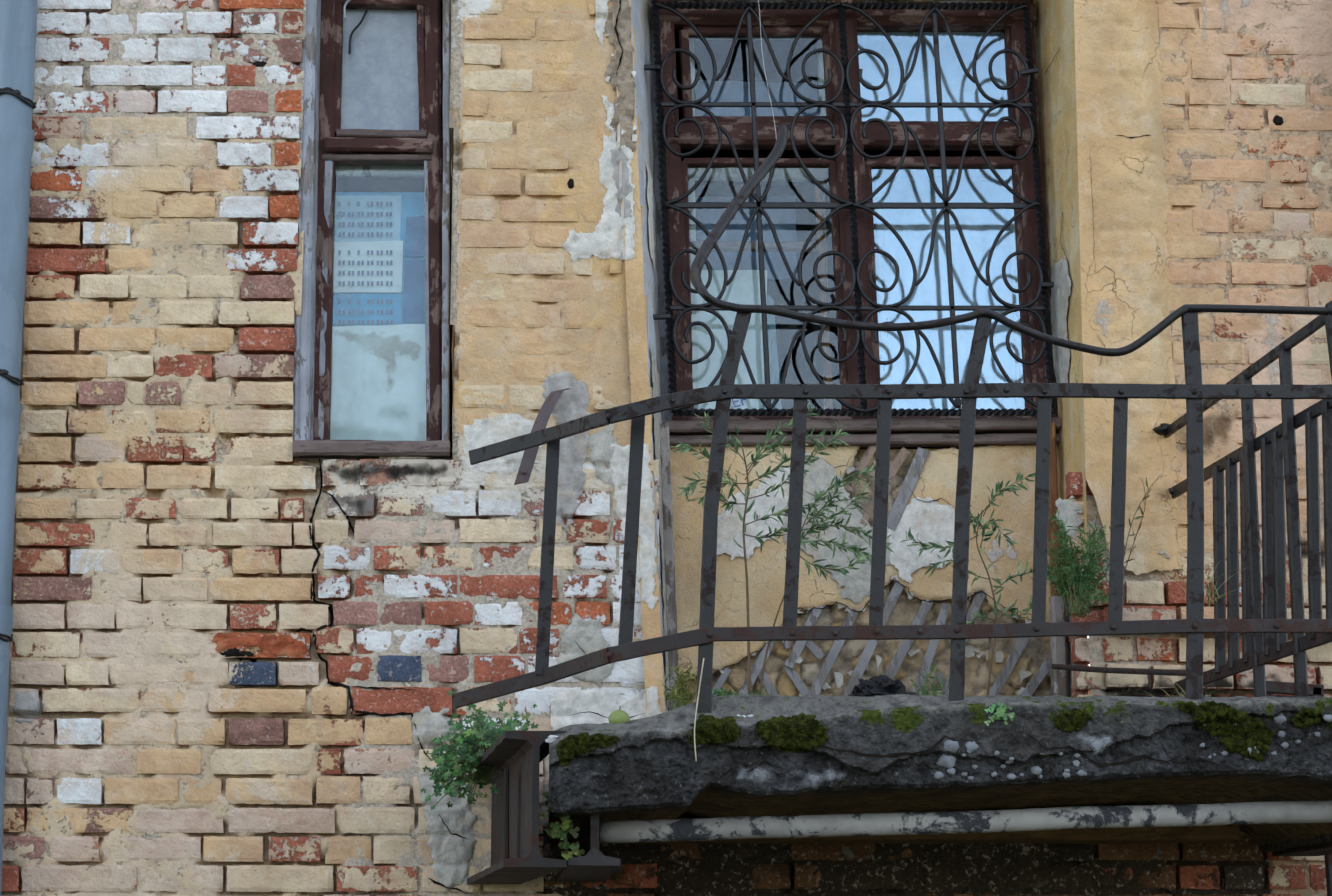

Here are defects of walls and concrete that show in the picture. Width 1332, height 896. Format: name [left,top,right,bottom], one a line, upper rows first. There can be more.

peeling [563,0,655,268]
crack [293,456,431,760]
peeling [549,345,670,731]
peeling [717,453,955,614]
peeling [986,536,1017,573]
flaking render [1056,495,1083,538]